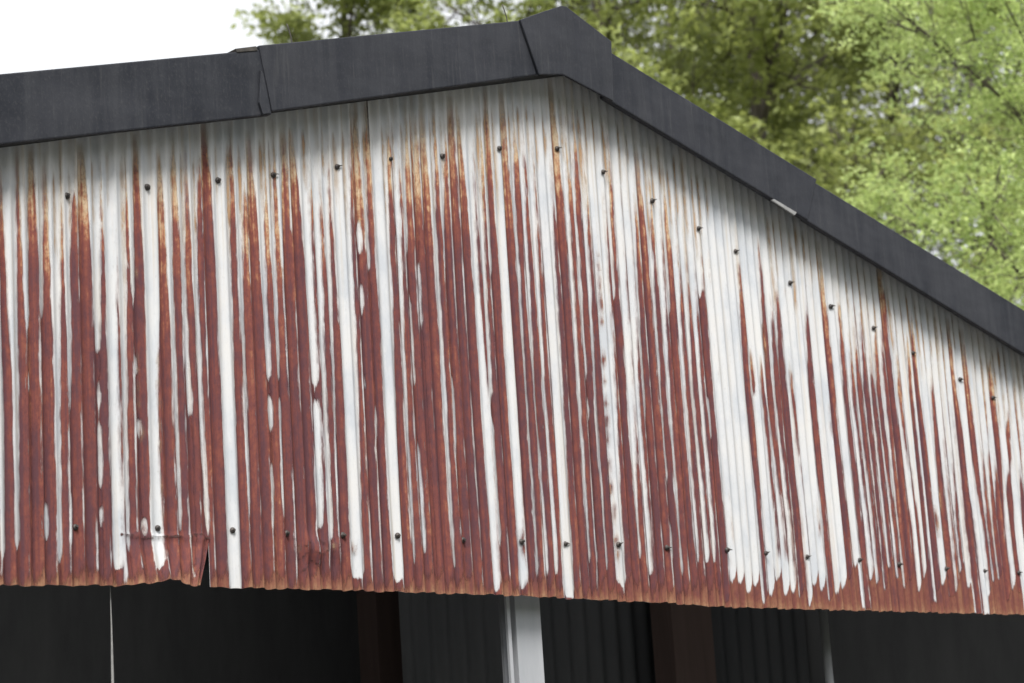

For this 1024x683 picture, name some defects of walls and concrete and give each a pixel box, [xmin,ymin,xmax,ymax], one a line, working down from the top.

rust [0,103,1024,615]